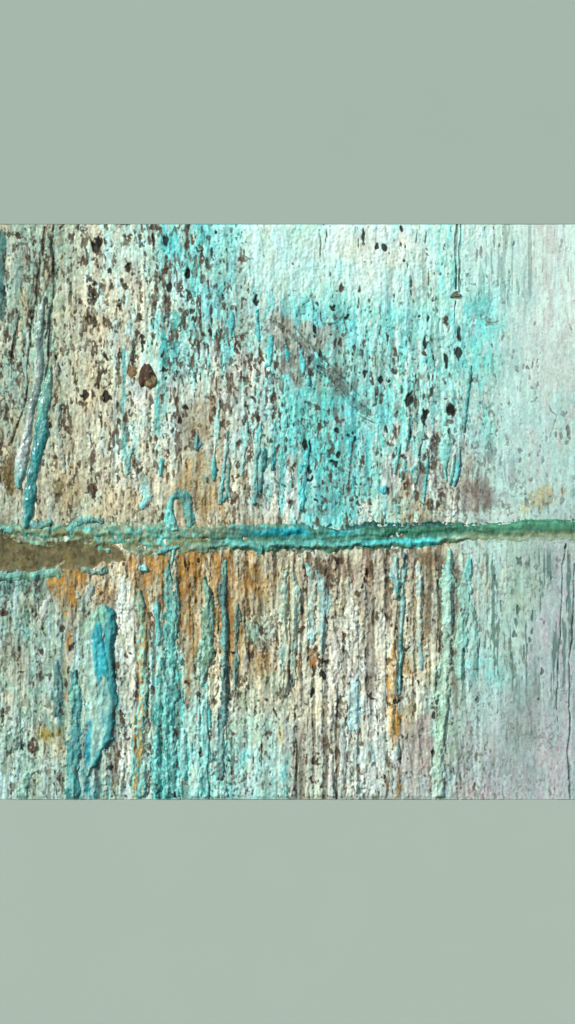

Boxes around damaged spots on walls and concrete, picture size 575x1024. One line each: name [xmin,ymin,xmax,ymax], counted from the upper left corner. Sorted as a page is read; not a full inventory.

peeling [0,695,30,728]
corrosion [48,568,87,661]
peeling [64,605,138,777]
corrosion [128,554,165,628]
corrosion [179,551,257,705]
peeling [248,604,270,661]
peeling [299,606,329,706]
corrosion [387,676,400,744]
peeling [7,738,64,786]
peeling [311,747,348,781]